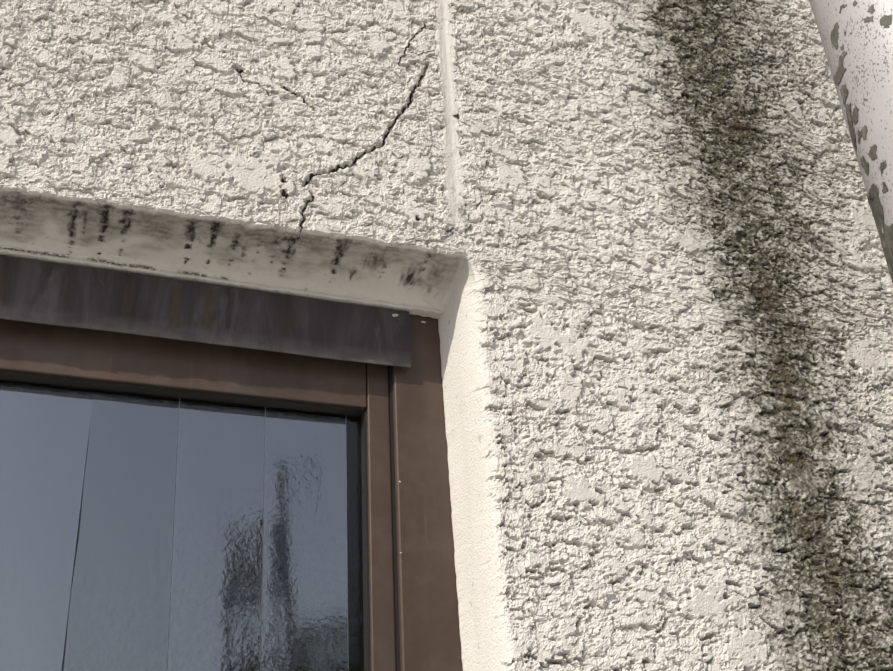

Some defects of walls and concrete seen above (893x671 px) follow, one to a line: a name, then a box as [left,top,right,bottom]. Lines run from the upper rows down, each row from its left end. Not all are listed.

crack [240,74,314,109]
crack [297,24,431,240]
leakage [0,196,171,255]
leakage [184,221,225,263]
leakage [231,230,318,270]
leakage [332,240,351,274]
leakage [644,0,893,671]